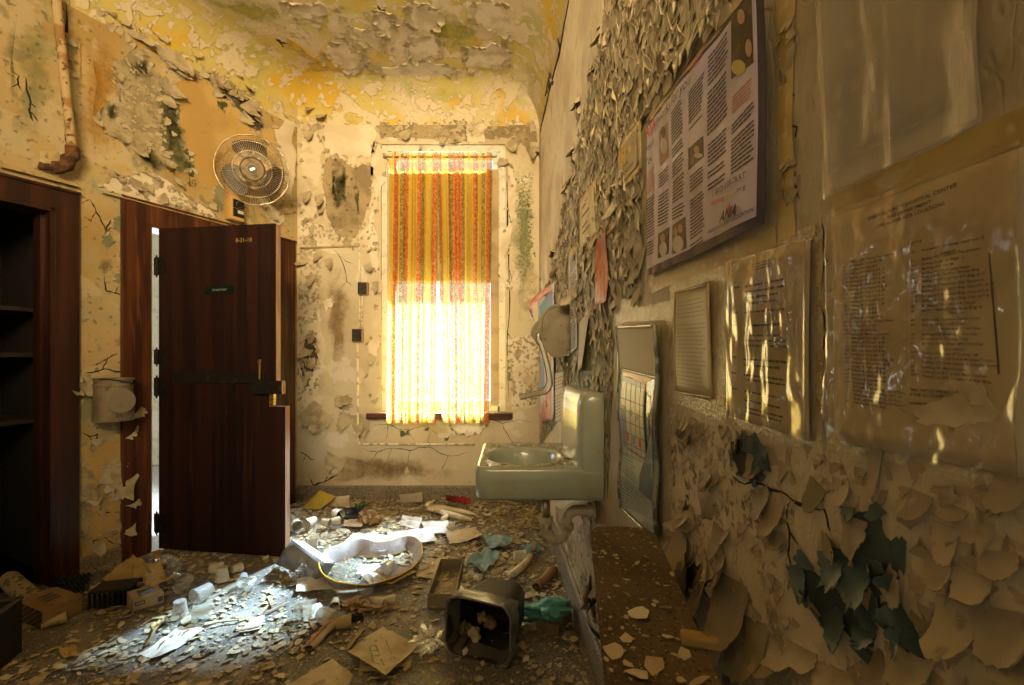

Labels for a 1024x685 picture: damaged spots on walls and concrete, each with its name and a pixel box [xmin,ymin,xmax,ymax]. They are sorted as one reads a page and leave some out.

crack [12,71,38,121]
crack [82,200,114,233]
leakage [140,150,161,171]
leakage [164,106,199,187]
mould [332,174,359,211]
peeling [92,0,732,499]
mould [515,174,538,288]
peeling [72,373,93,423]
peeling [80,406,148,557]
crack [367,423,467,469]
crack [733,477,831,565]
peeling [555,416,1024,685]